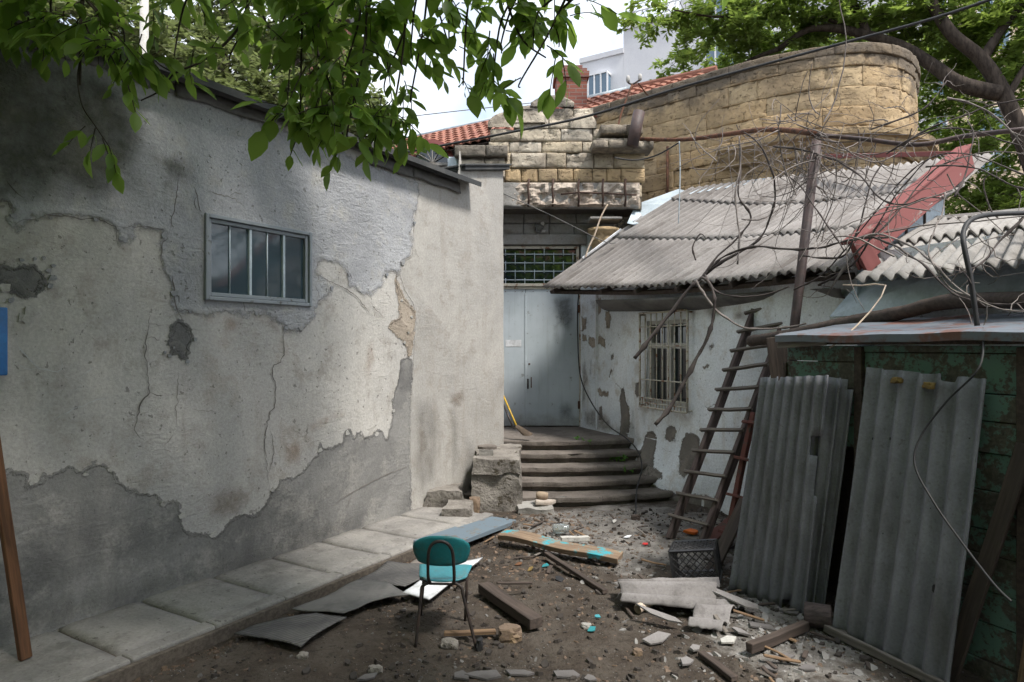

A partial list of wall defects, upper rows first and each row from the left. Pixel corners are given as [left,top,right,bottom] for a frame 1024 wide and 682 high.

crack [6,186,243,451]
peeling [0,47,419,647]
crack [264,320,308,483]
flaking render [598,382,639,437]
flaking render [636,426,713,508]